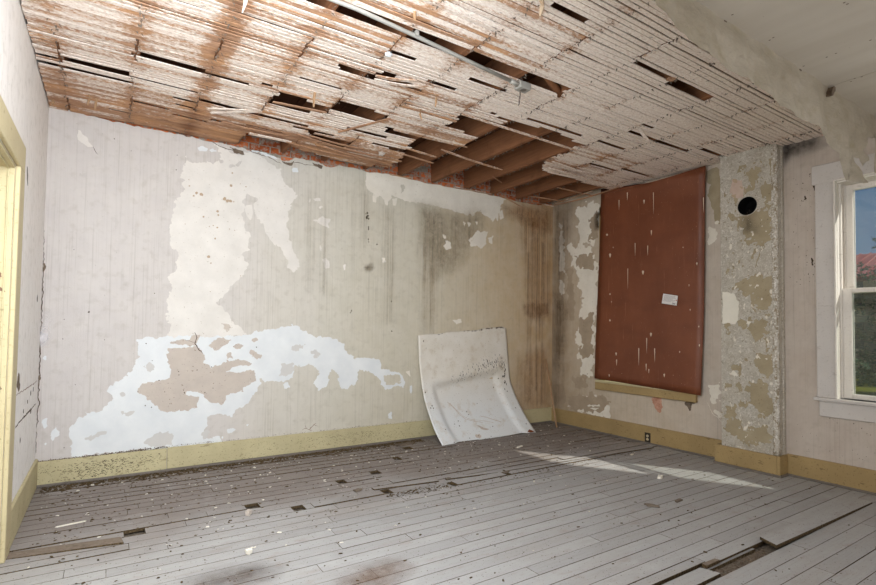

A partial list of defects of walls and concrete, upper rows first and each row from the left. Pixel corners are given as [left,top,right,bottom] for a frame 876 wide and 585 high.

peeling [41,144,412,458]
peeling [365,172,506,249]
peeling [553,200,611,418]
peeling [706,158,778,447]